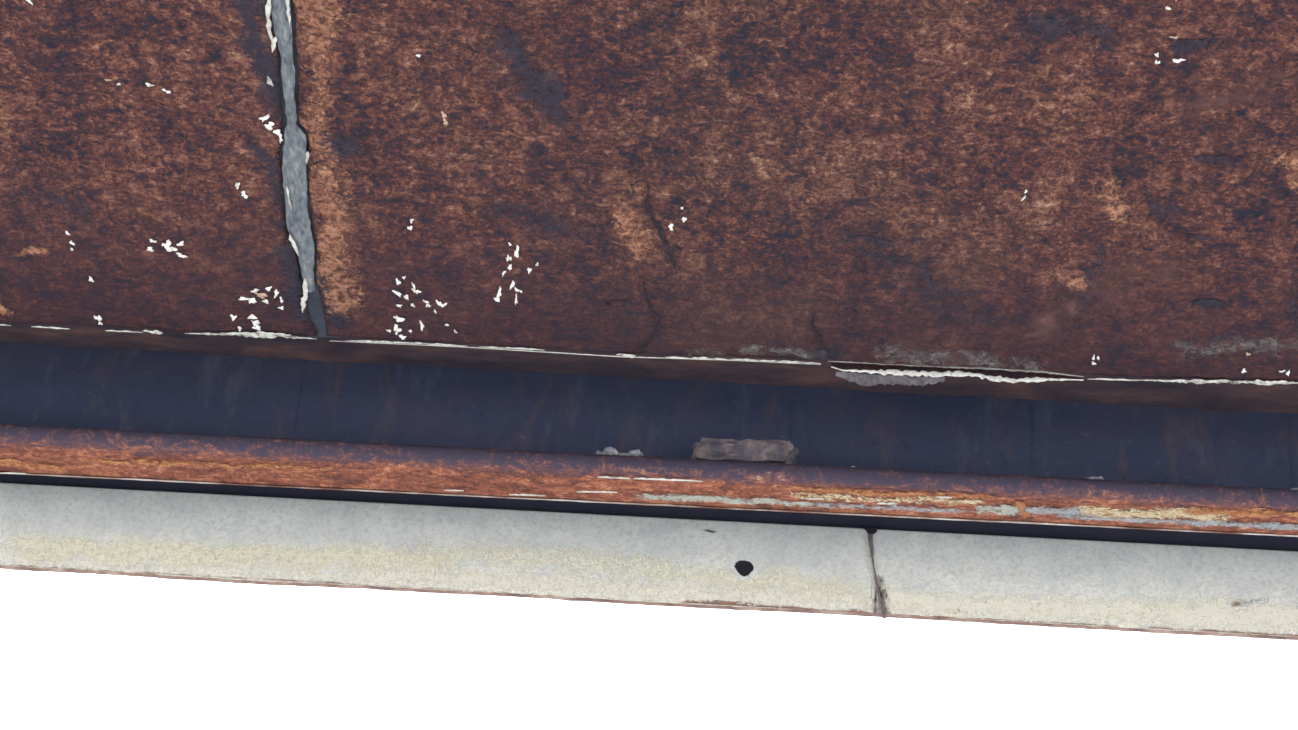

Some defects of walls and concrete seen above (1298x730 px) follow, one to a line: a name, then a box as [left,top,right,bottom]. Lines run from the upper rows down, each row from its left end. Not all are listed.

rust [293,0,364,315]
rust [1268,152,1298,189]
rust [1099,178,1135,223]
rust [18,246,50,255]
rust [612,204,653,260]
peeling [185,286,314,339]
peeling [337,276,1298,386]
rust [0,459,66,472]
rust [90,459,330,472]
peeling [638,493,1298,530]
rust [1181,508,1298,518]
crack [863,528,889,619]